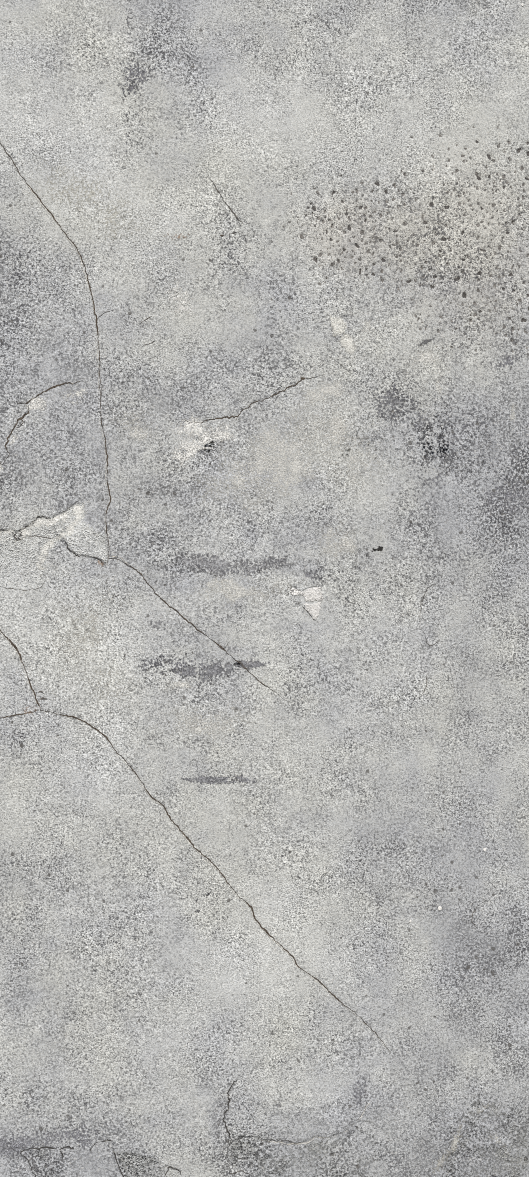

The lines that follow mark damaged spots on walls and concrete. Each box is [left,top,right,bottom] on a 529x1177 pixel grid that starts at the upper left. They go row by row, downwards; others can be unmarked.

crack [0,143,285,700]
crack [185,376,317,423]
crack [0,630,390,1051]